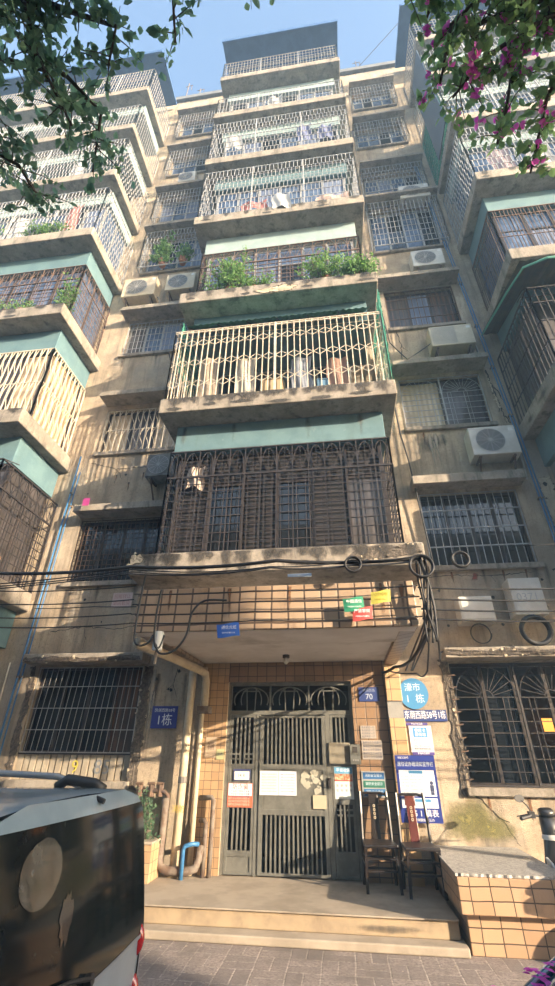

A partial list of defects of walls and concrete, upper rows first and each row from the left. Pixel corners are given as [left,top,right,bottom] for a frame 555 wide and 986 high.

spalling [5,654,157,791]
spalling [437,645,555,797]